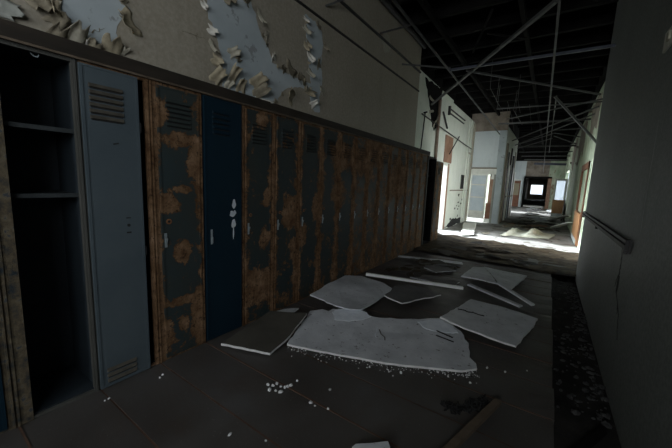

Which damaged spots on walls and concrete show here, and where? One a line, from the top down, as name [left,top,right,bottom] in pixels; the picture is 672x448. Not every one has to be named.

peeling [0,0,143,56]
peeling [200,0,330,113]